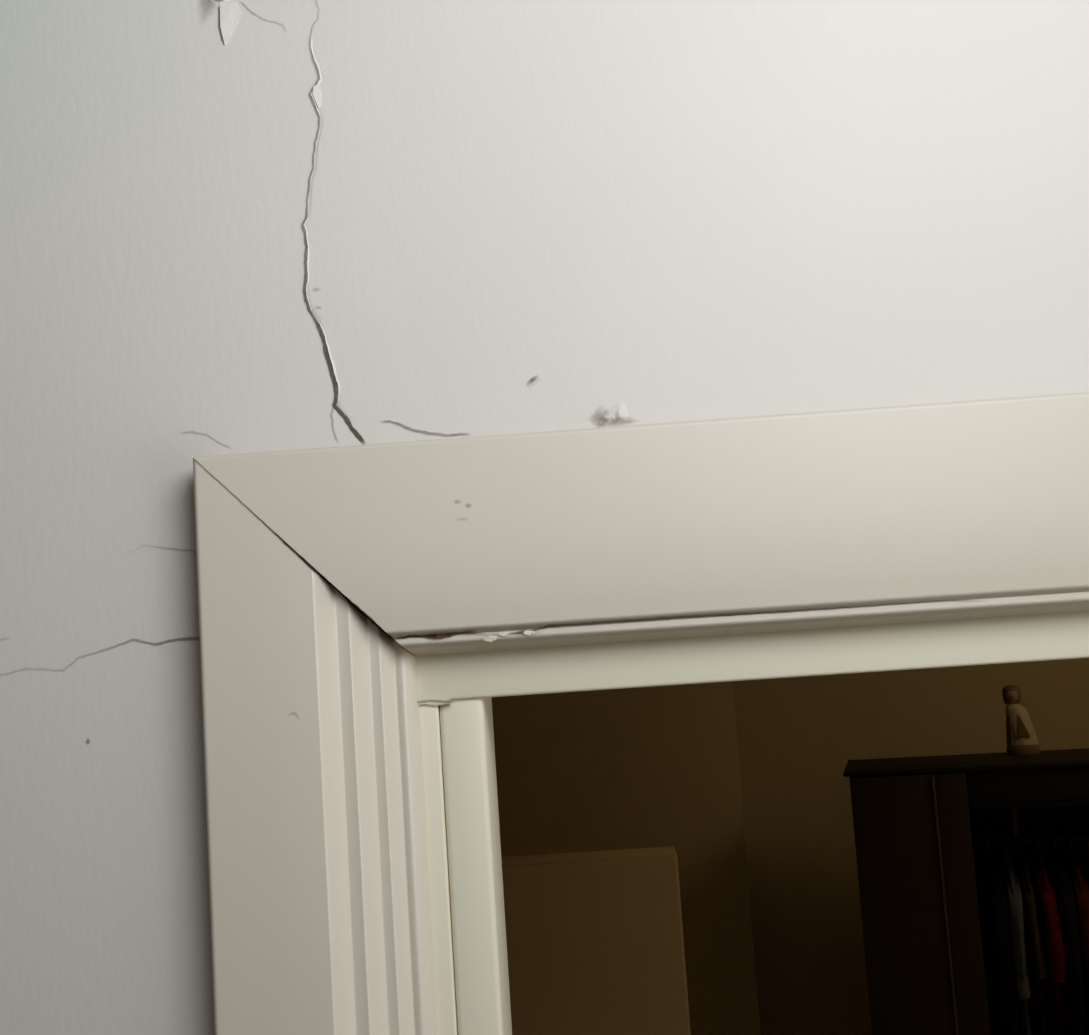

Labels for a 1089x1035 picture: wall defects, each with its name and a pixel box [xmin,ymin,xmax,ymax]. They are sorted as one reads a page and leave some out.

crack [302,39,364,443]